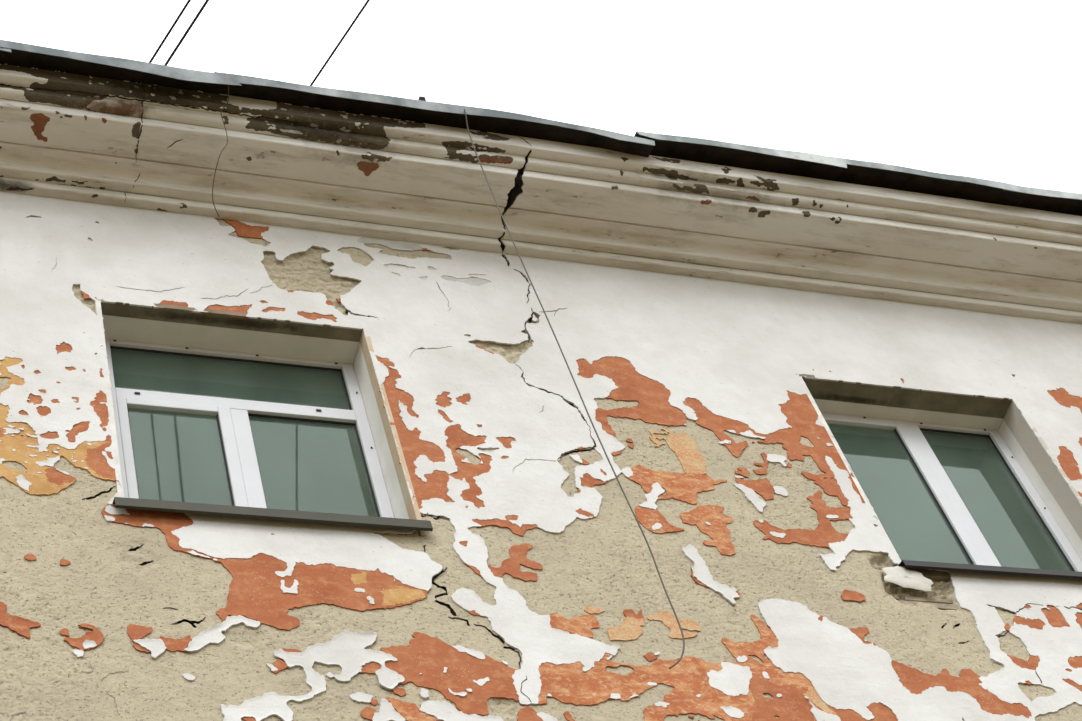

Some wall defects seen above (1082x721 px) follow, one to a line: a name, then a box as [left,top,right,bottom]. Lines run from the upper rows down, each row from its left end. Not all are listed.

peeling [0,175,106,198]
crack [0,83,300,203]
flaking render [0,63,426,176]
peeling [643,156,779,217]
peeling [56,342,73,354]
flaking render [72,285,96,314]
flaking render [159,219,490,322]
flaking render [465,313,539,364]
crack [498,137,568,342]
crack [515,365,596,467]
flaking render [0,355,1082,721]
crack [423,545,532,703]